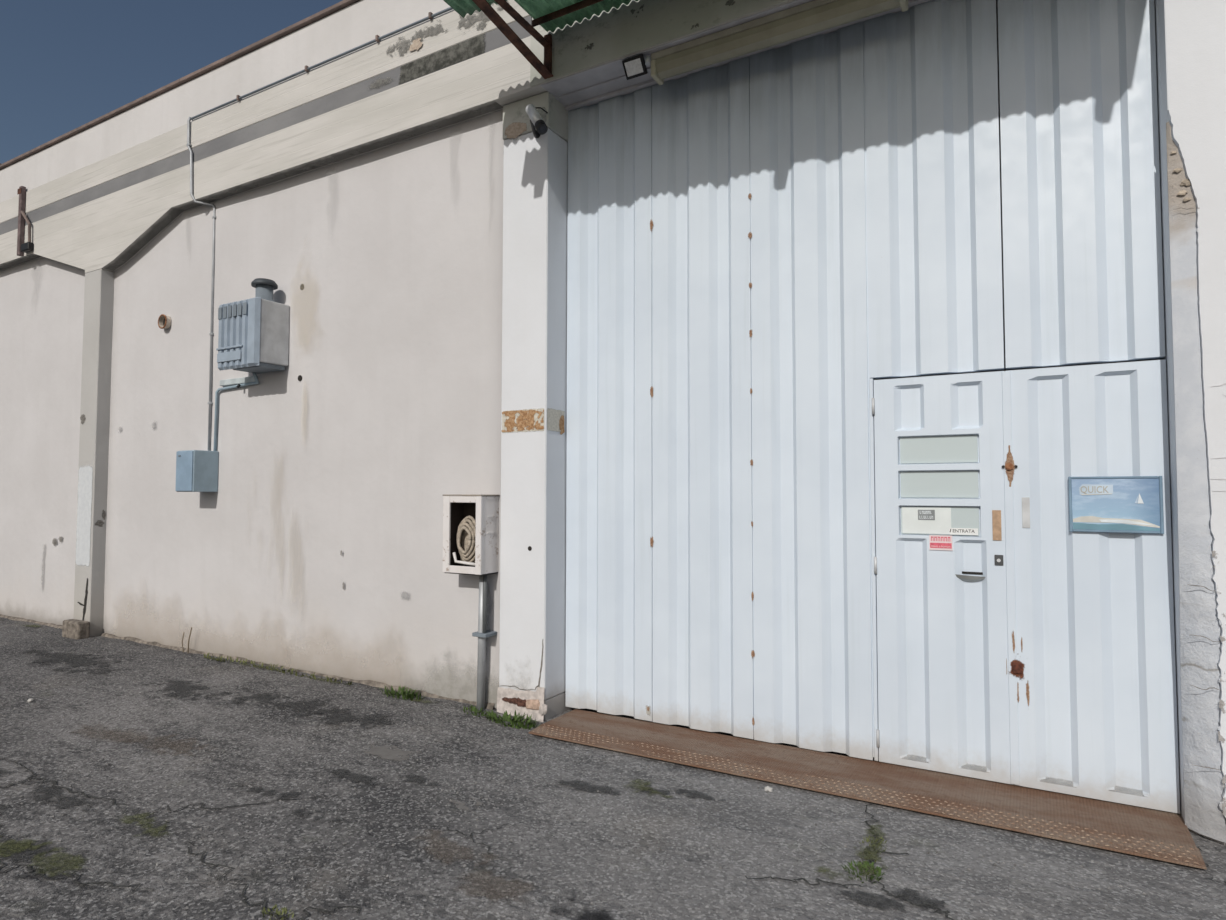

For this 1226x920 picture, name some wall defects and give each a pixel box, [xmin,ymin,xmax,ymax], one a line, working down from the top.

corrosion [1006,631,1029,706]
spalling [1166,122,1226,843]